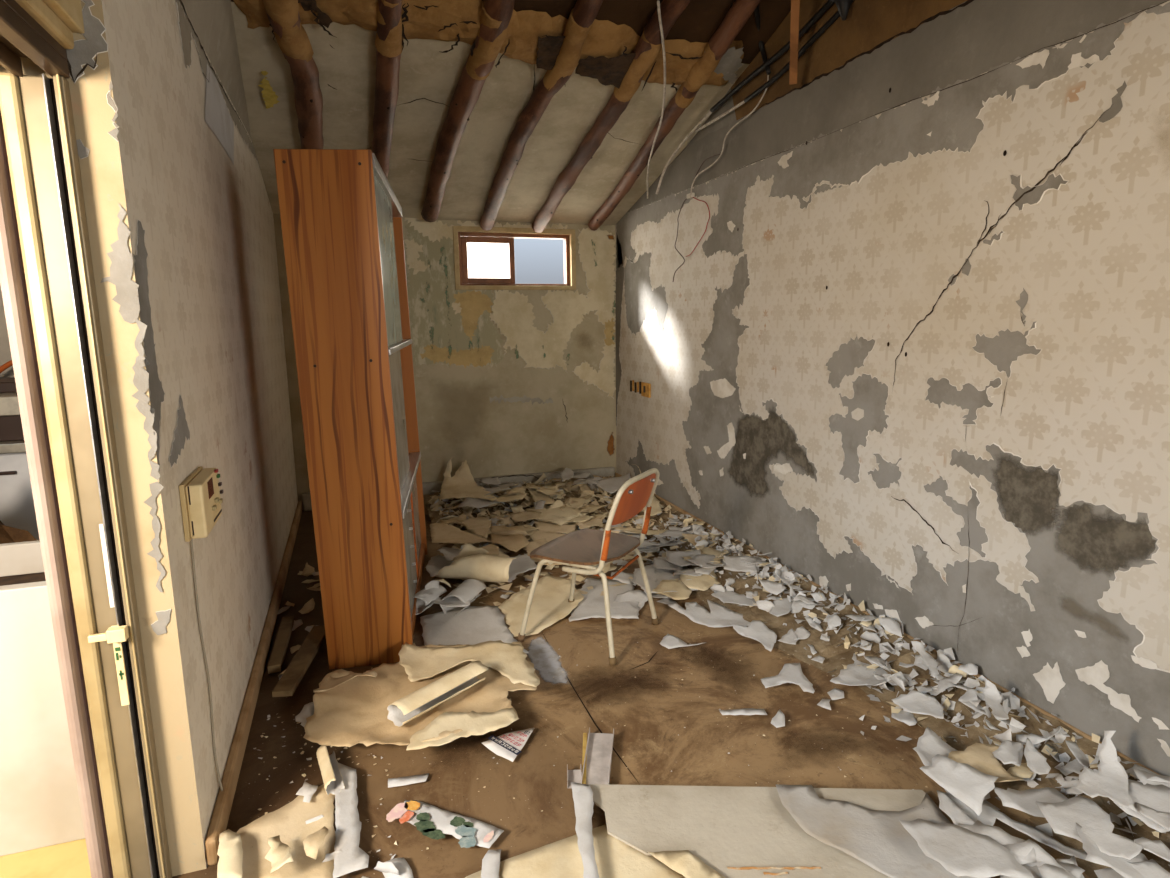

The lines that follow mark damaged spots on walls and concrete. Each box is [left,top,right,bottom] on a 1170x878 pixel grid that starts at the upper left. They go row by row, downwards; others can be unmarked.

peeling [1016,34,1100,70]
crack [893,81,1127,385]
peeling [403,218,616,399]
peeling [710,378,736,398]
peeling [704,422,746,477]
water stain [729,411,814,496]
water stain [995,457,1157,572]
peeling [873,603,902,627]
peeling [915,616,934,628]
peeling [1016,629,1033,658]
peeling [1131,655,1158,669]
peeling [1033,660,1170,757]